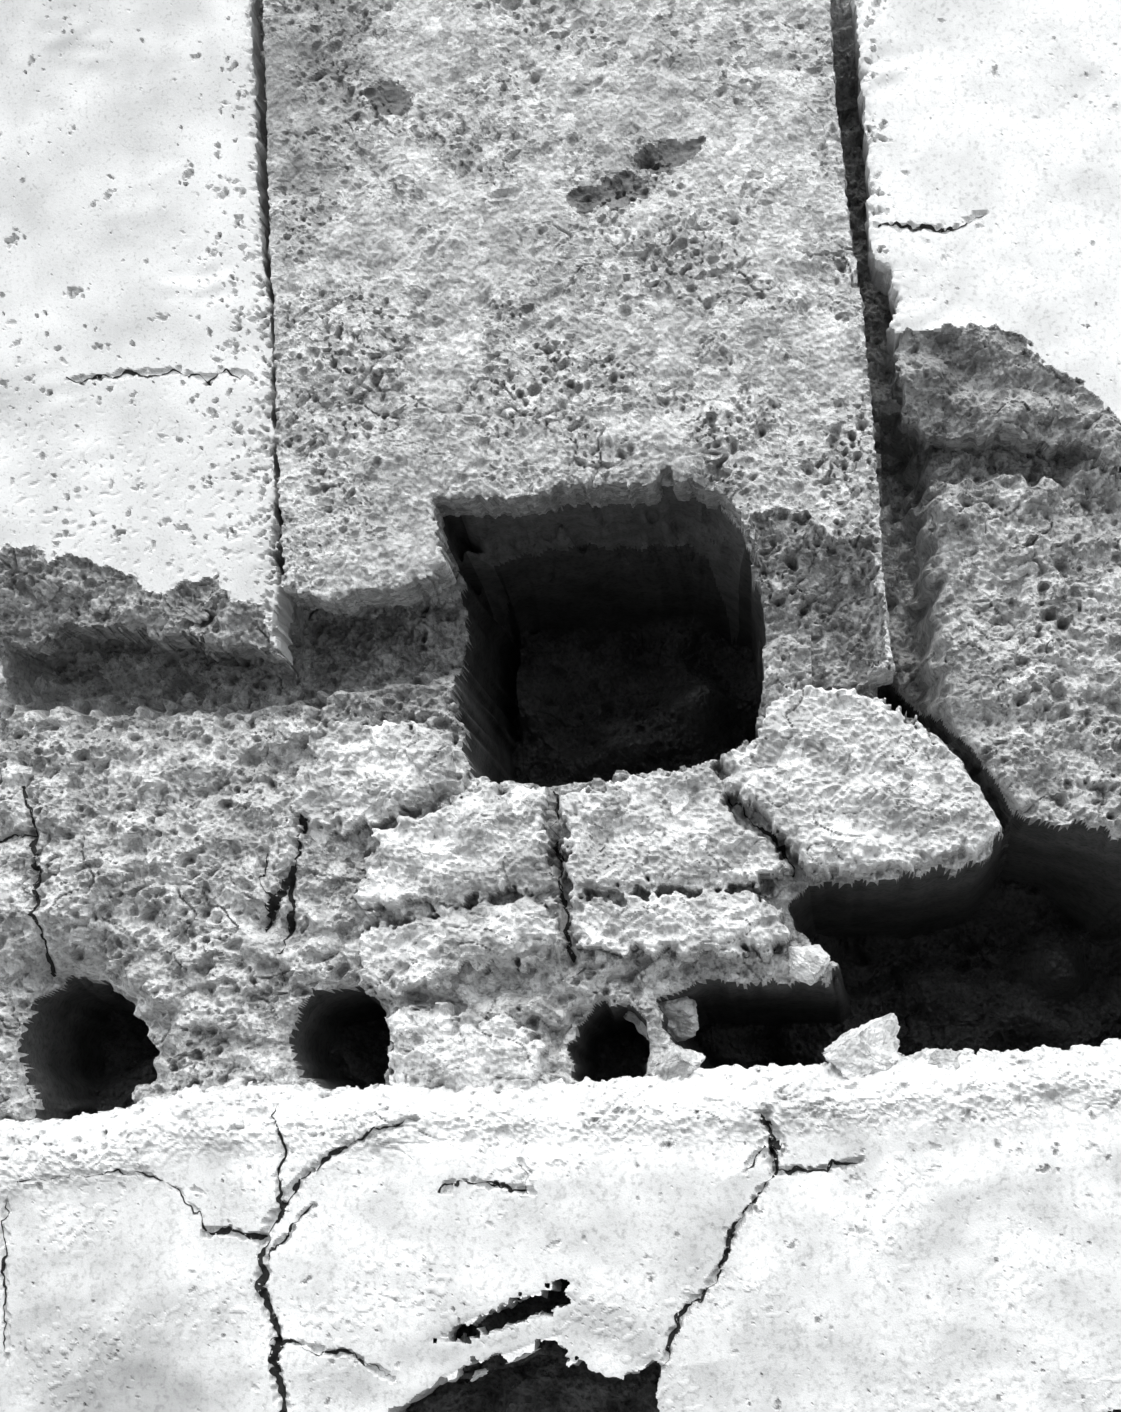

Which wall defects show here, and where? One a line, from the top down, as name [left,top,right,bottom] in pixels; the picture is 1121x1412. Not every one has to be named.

crack [878,216,983,233]
spalling [893,323,1121,479]
spalling [0,543,294,671]
spalling [747,507,887,694]
crack [877,684,1013,876]
crack [0,786,56,977]
crack [258,814,308,986]
spalling [656,810,1121,1070]
crack [0,1108,416,1412]
spalling [456,1279,571,1340]
spalling [406,1339,661,1412]
crack [664,1114,860,1365]